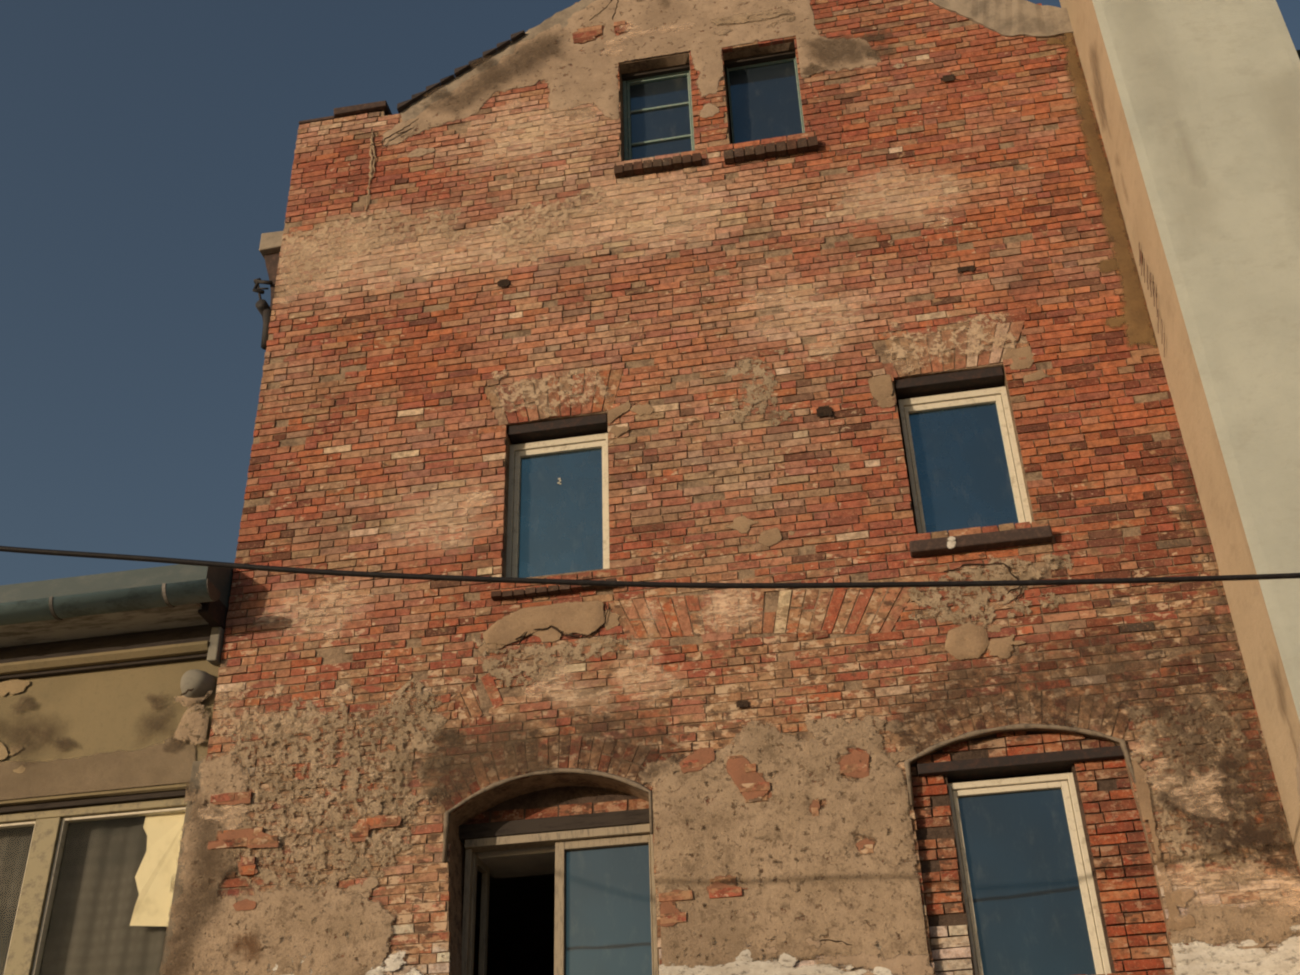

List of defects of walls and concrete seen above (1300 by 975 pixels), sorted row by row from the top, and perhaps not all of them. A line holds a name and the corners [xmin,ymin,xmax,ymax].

crack [365,119,418,212]
flaking render [382,0,905,158]
flaking render [0,678,451,975]
flaking render [638,700,934,975]